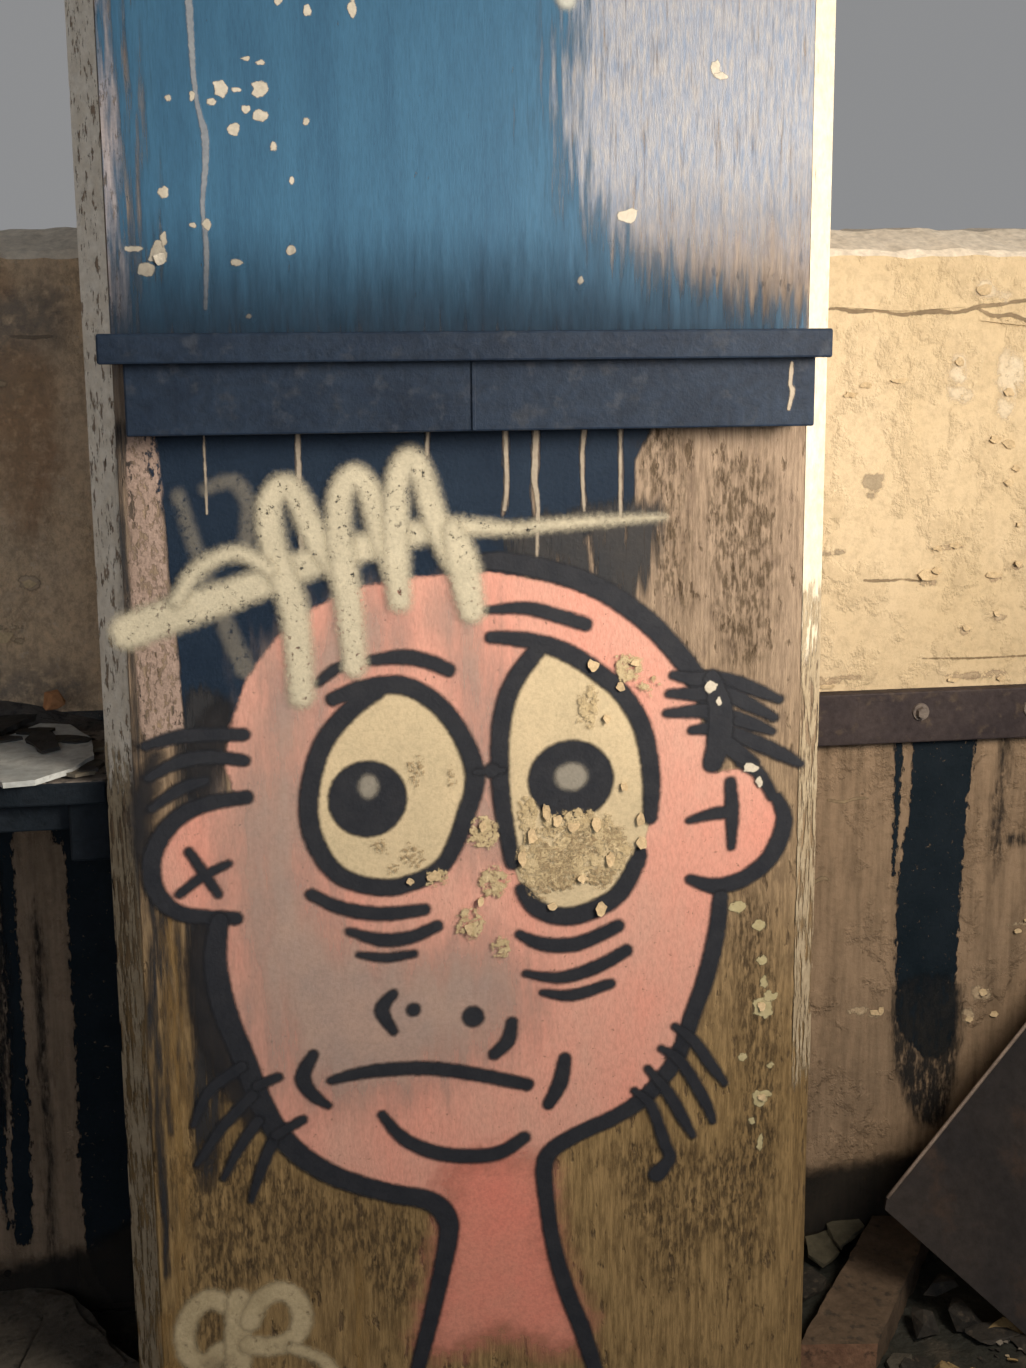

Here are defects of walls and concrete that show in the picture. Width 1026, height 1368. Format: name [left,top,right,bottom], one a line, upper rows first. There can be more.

spalling [347,0,356,18]
spalling [189,56,268,136]
peeling [809,0,836,328]
crack [828,299,1026,326]
peeling [752,357,861,1084]
peeling [370,839,448,887]
peeling [455,796,647,958]
peeling [728,901,766,931]
peeling [748,1090,772,1151]